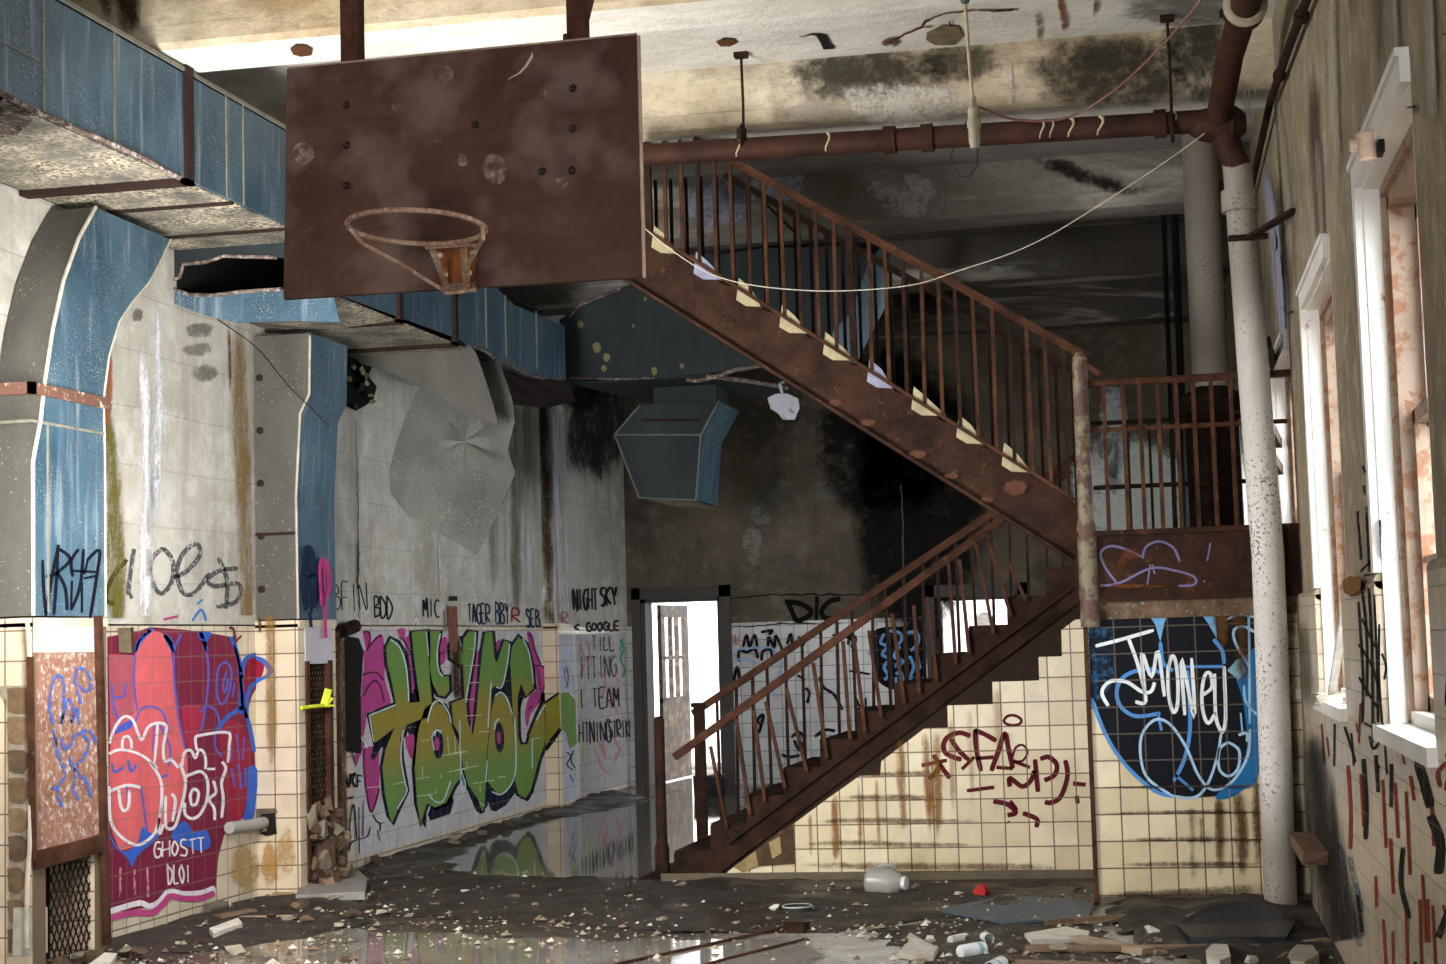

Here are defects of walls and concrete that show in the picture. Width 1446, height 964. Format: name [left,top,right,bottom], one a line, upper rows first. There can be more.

leakage [101,0,140,28]
leakage [1037,24,1221,139]
leakage [185,324,217,381]
leakage [106,309,163,618]
corrosion [228,336,276,753]
corrosion [1214,615,1247,676]
corrosion [261,844,277,879]
corrosion [1191,786,1260,872]